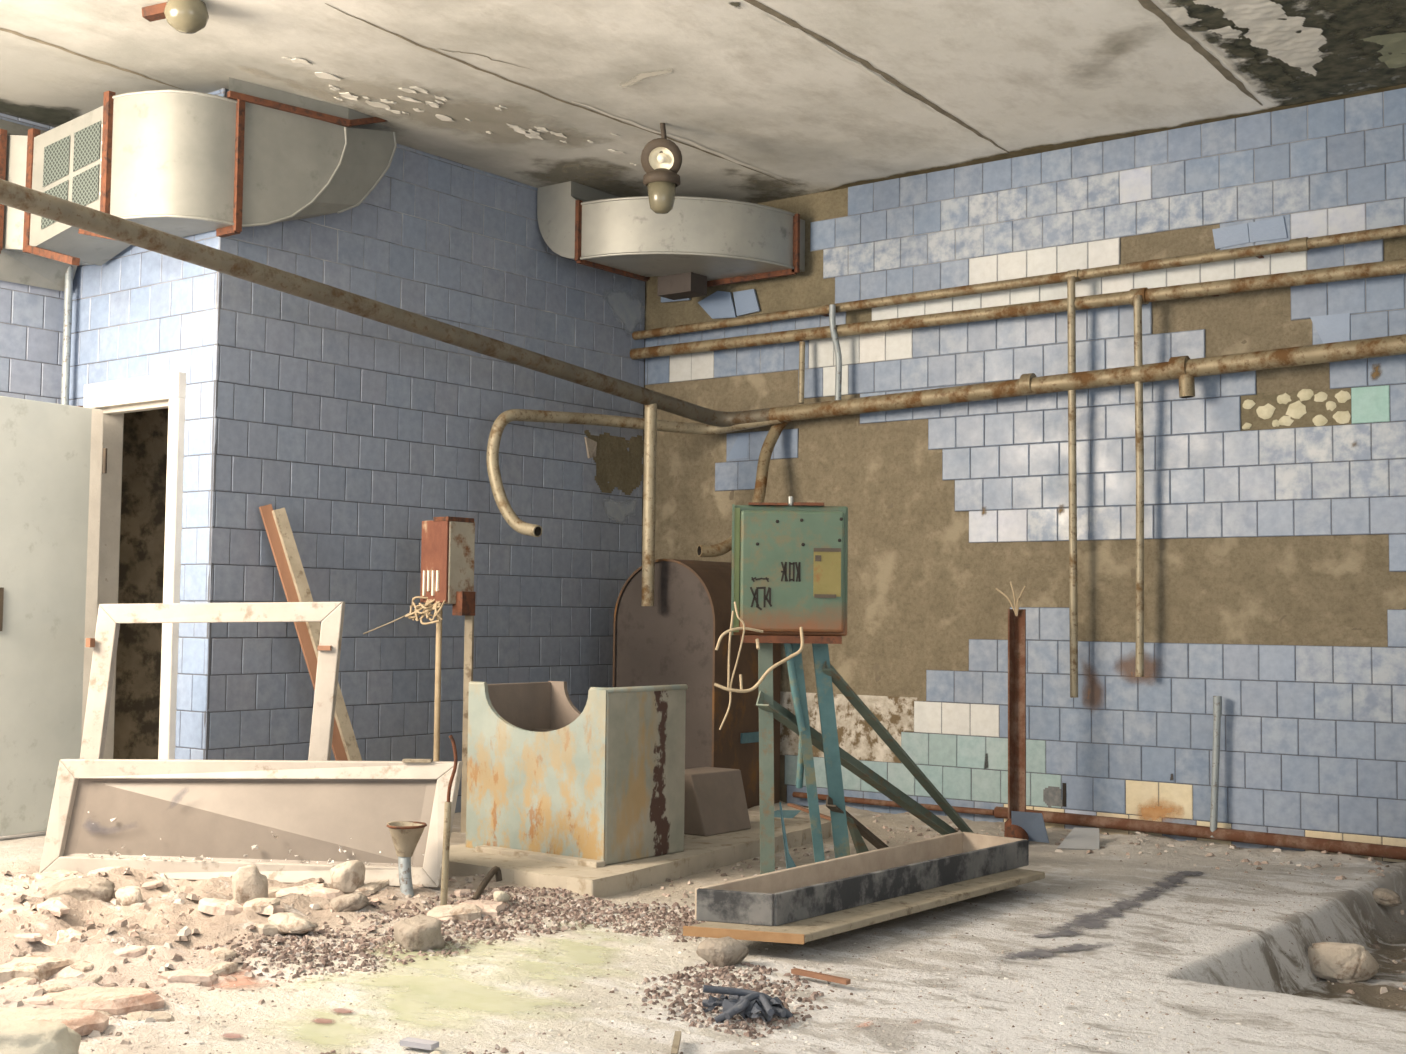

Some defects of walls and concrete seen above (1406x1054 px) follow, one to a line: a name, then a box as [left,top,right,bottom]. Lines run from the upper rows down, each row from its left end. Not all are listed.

peeling [282,57,472,122]
peeling [486,105,567,143]
water stain [530,160,642,197]
water stain [747,176,800,203]
peeling [645,188,872,330]
peeling [1120,224,1220,264]
peeling [1383,236,1406,261]
peeling [1152,287,1350,357]
peeling [1245,363,1332,396]
peeling [584,370,1406,701]
corrosion [1141,805,1174,820]